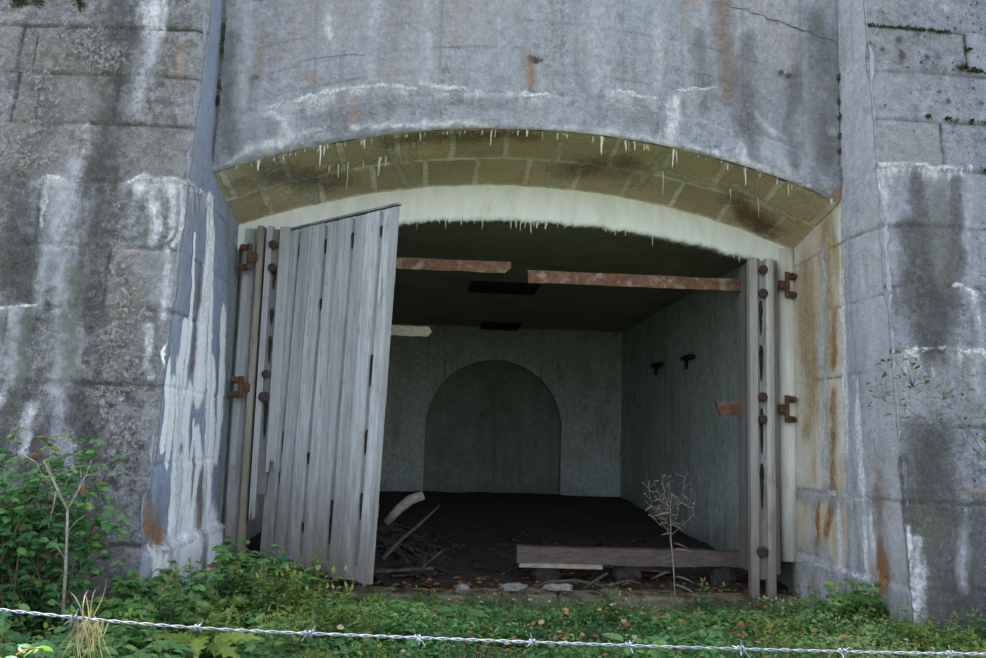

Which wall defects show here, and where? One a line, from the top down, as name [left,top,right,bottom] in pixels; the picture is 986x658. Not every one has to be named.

corrosion [527,56,543,90]
crack [723,2,837,43]
damp [0,0,226,590]
damp [875,162,986,392]
corrosion [143,501,165,552]
corrosion [814,390,836,558]
damp [900,413,986,641]